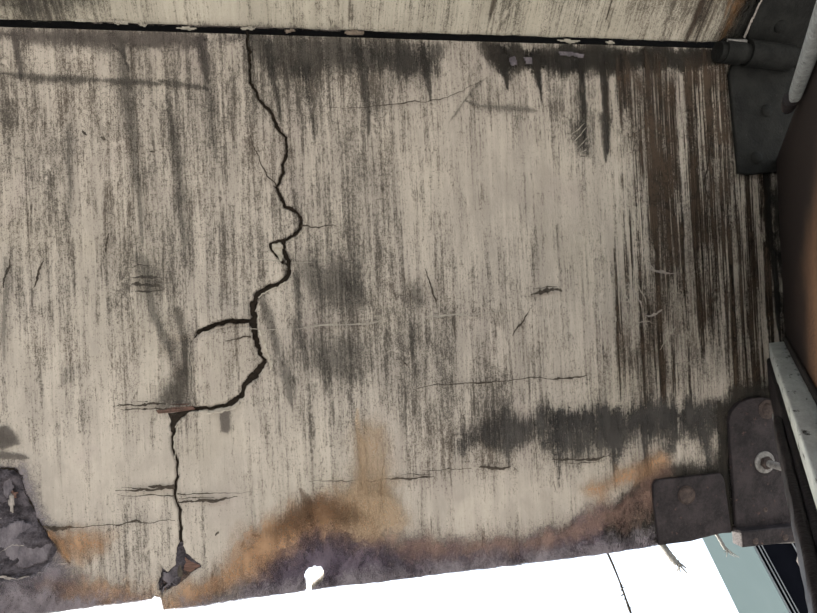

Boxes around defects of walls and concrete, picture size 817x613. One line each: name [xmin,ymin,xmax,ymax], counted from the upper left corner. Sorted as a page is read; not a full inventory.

crack [3,256,11,288]
crack [34,261,44,287]
crack [43,31,336,564]
water stain [179,0,786,609]
water stain [158,307,194,411]
spalling [0,467,80,580]
rust [53,583,145,606]
spalling [158,542,201,593]
rust [163,452,668,610]